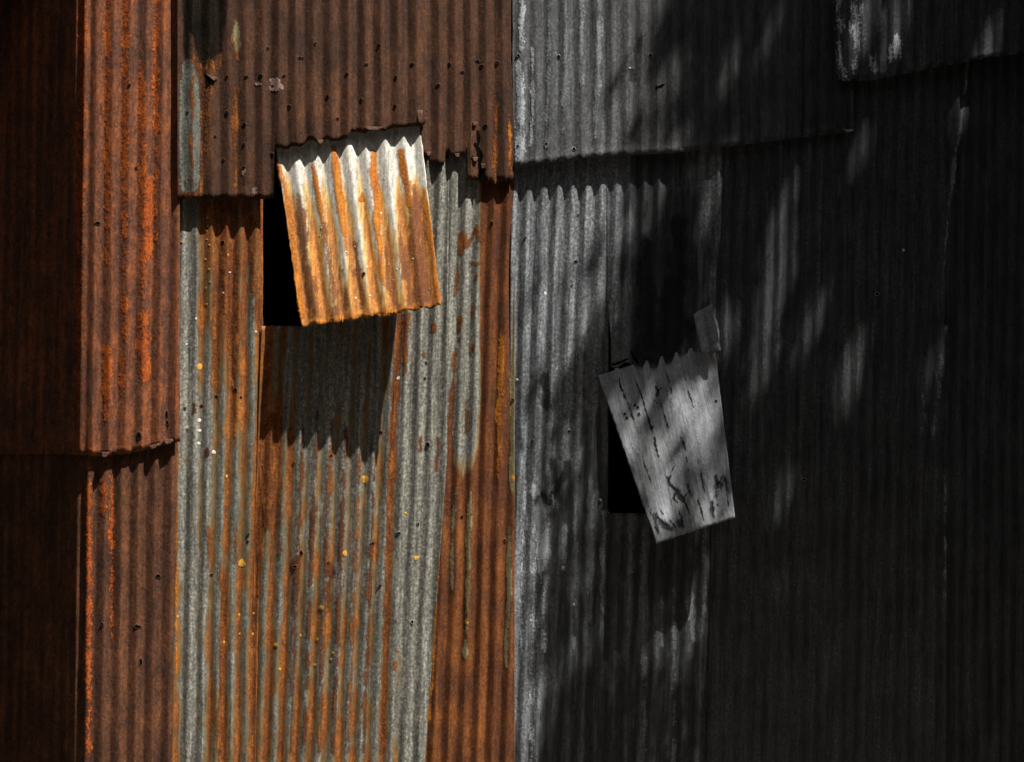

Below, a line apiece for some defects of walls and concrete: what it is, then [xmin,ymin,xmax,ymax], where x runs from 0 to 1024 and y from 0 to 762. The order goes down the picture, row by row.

corrosion [75,0,88,419]
corrosion [100,0,161,421]
corrosion [230,83,241,188]
corrosion [492,96,512,182]
corrosion [251,146,484,755]
corrosion [495,334,505,480]
corrosion [83,467,116,757]
corrosion [206,524,228,755]